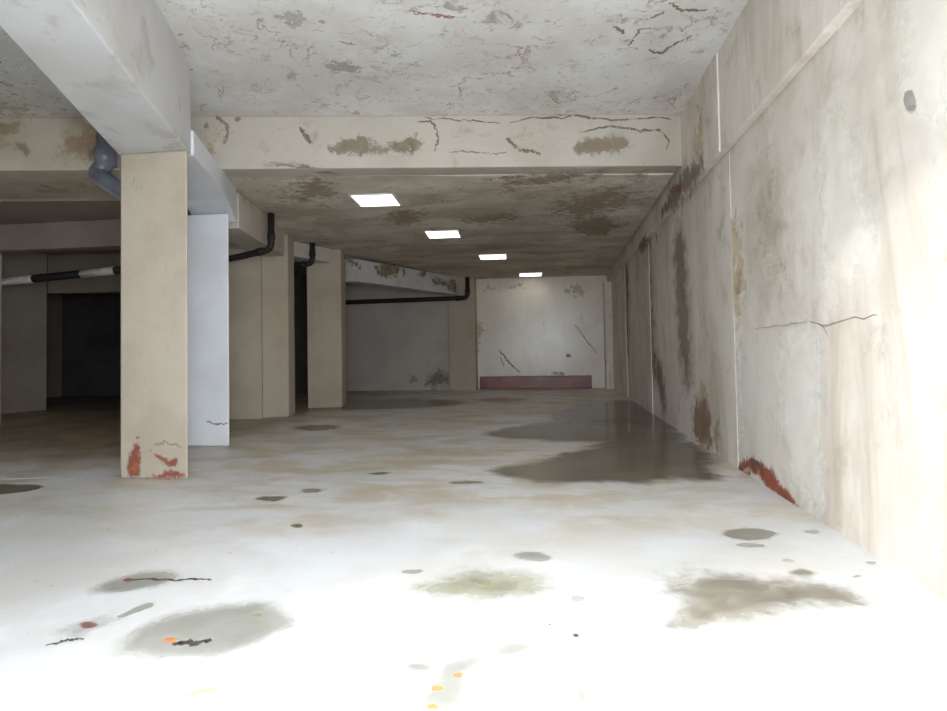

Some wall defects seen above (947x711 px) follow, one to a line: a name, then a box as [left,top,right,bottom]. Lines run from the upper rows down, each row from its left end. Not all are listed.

peeling [328,120,439,157]
crack [425,114,671,156]
peeling [574,125,670,156]
water stain [278,163,347,203]
water stain [501,171,652,236]
water stain [661,155,704,218]
crack [755,314,876,337]
corrosion [127,436,185,479]